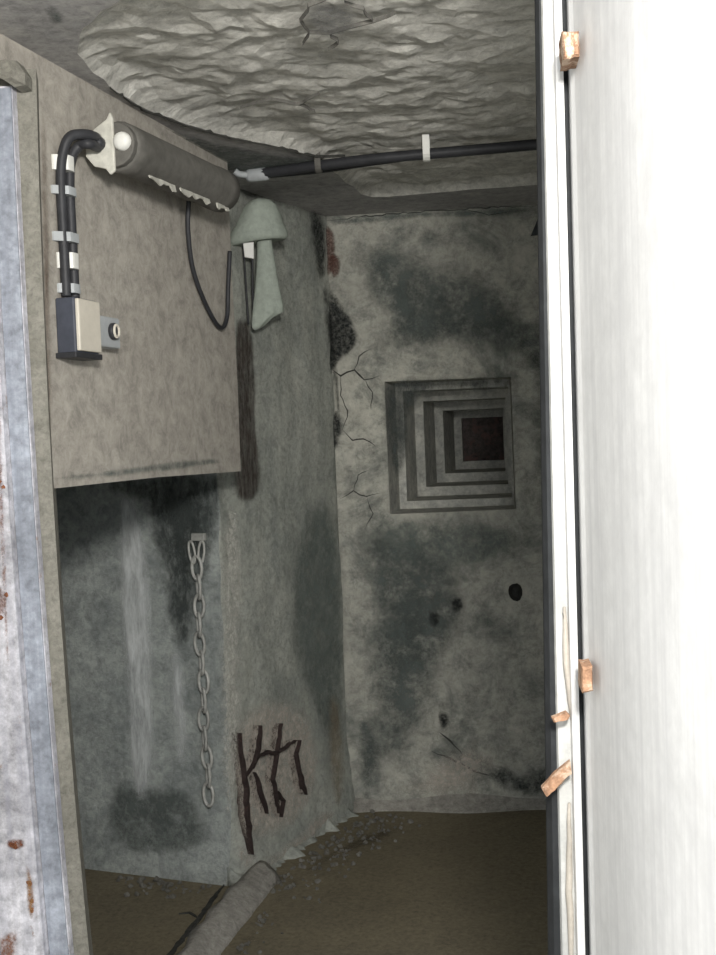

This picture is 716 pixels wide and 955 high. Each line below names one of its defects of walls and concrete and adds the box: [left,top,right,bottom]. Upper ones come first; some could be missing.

crack [299,0,395,51]
crack [110,87,345,158]
water stain [370,254,539,365]
water stain [114,503,200,849]
water stain [362,523,516,771]
water stain [494,770,545,794]
corrosion [26,873,34,913]
corrosion [1,935,16,955]